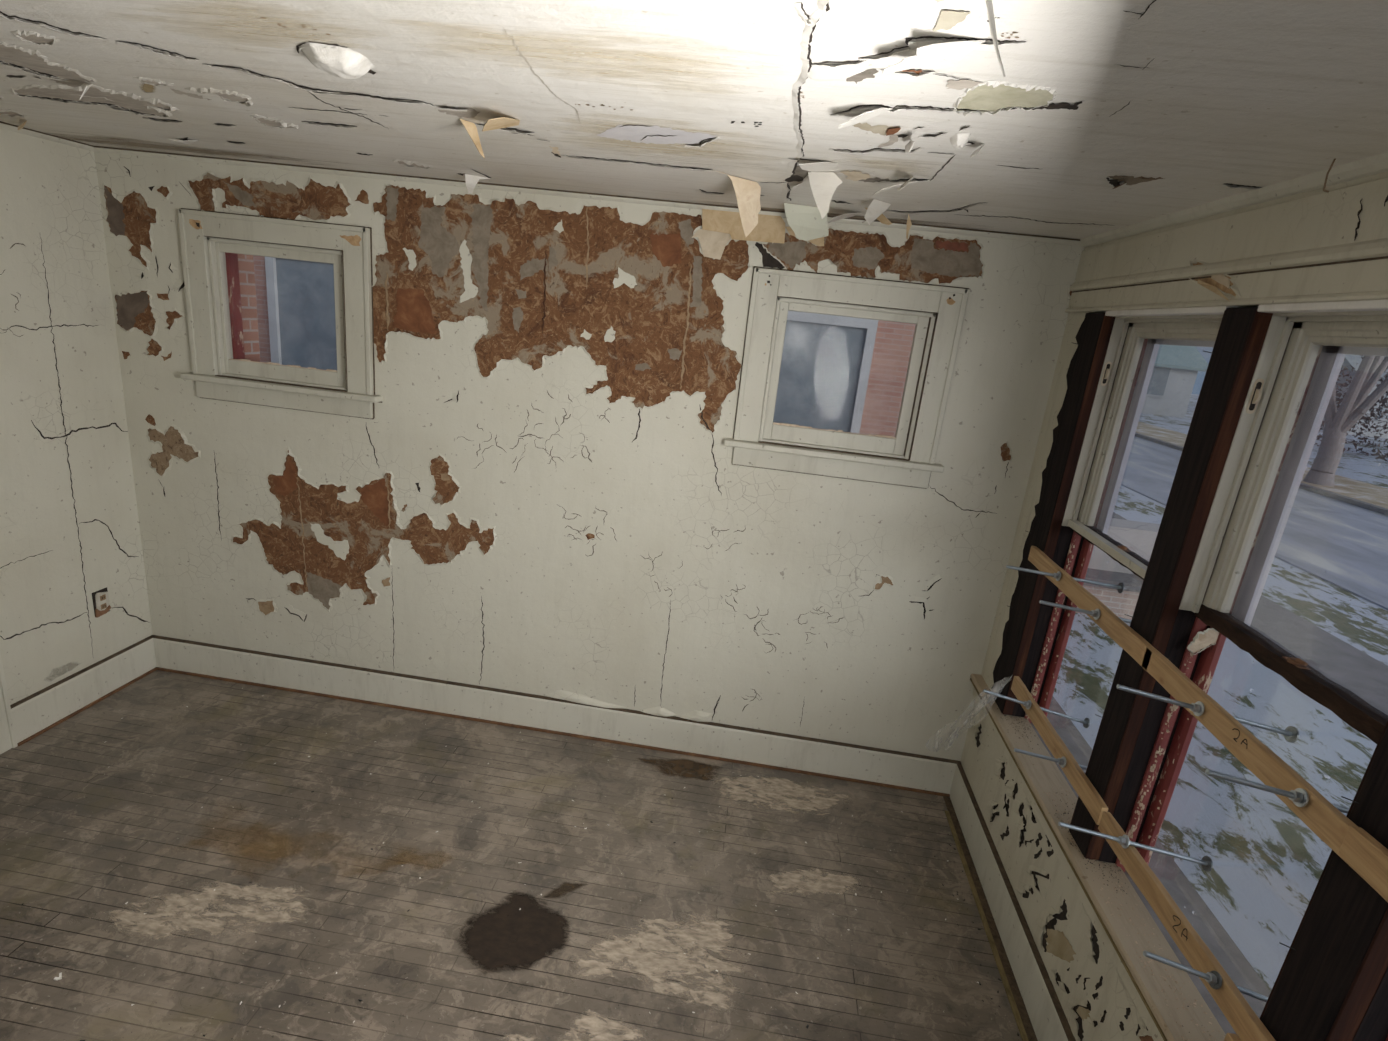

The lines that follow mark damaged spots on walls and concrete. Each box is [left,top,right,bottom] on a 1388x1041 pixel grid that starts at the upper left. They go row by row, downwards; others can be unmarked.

crack [0,11,725,196]
peeling [797,0,1082,158]
crack [791,0,1107,225]
peeling [101,159,985,434]
crack [0,237,150,658]
peeling [145,414,201,496]
peeling [231,447,497,622]
crack [444,390,641,472]
crack [557,504,746,706]
crack [700,407,721,493]
crack [720,585,844,653]
damp [459,882,587,972]